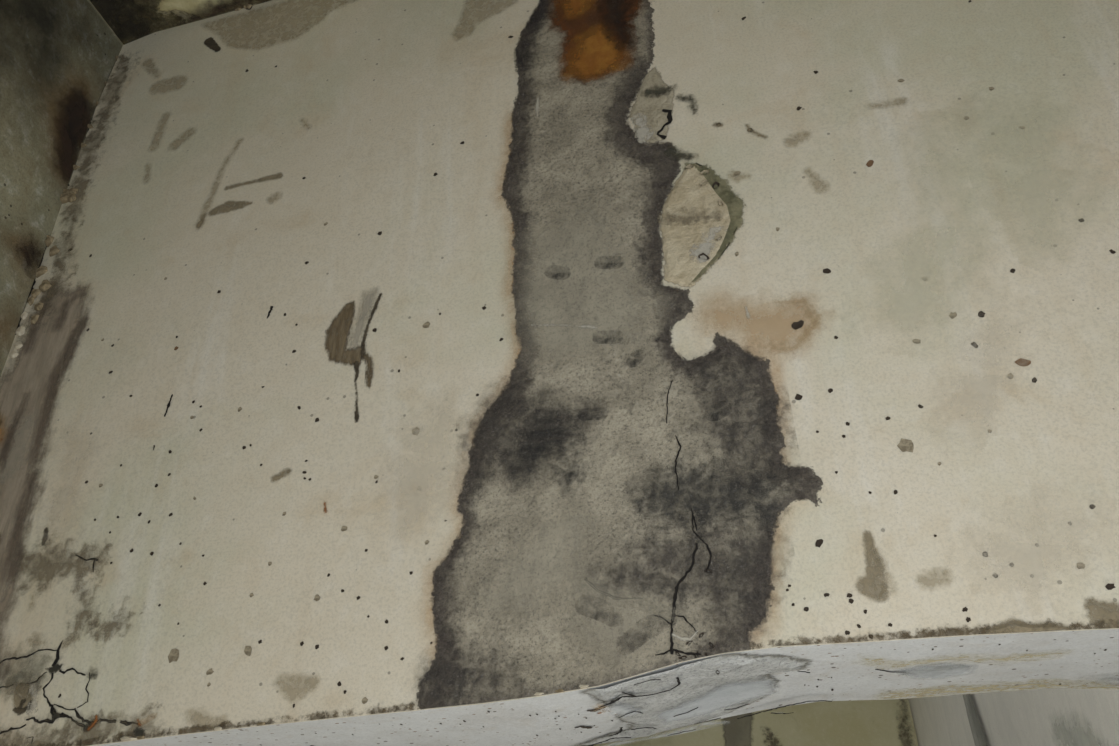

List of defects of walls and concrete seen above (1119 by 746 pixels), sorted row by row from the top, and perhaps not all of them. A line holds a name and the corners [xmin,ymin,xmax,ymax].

leakage [0,0,355,84]
peeling [157,0,261,18]
rust [550,0,642,81]
spalling [629,67,746,288]
leakage [0,287,88,642]
leakage [424,0,598,708]
crack [600,380,714,707]
leakage [596,59,815,653]
crack [0,640,145,743]